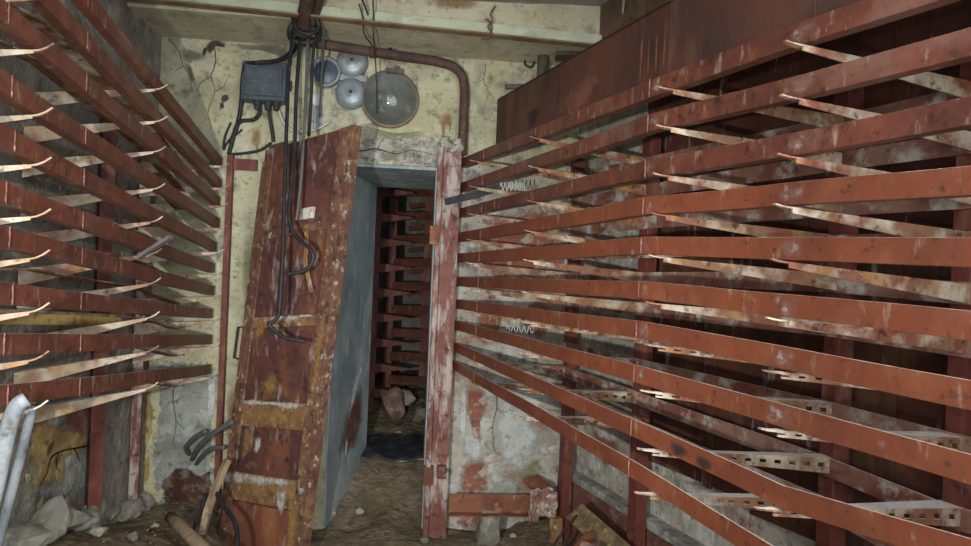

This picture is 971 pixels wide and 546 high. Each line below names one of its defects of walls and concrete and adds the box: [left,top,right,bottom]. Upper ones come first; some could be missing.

crack [168,39,229,128]
spalling [421,136,464,169]